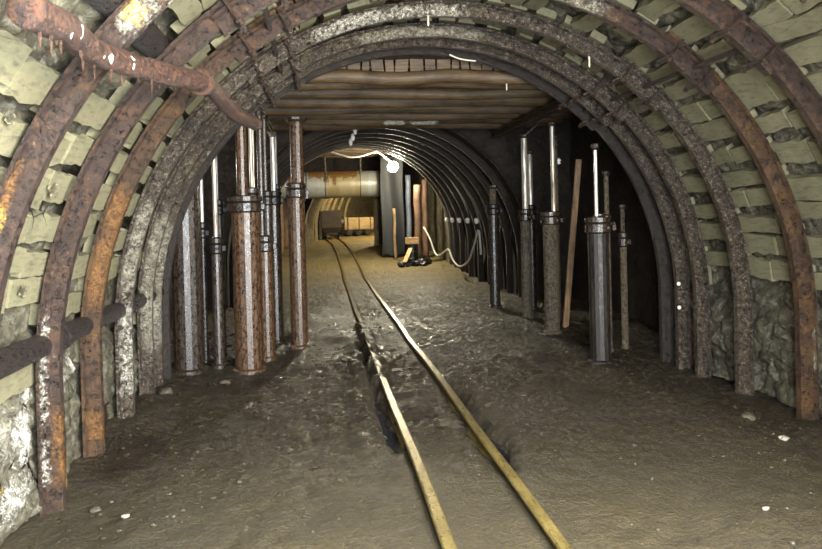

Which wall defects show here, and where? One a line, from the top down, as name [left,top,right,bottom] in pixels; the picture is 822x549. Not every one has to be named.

corrosion [120,0,148,28]
corrosion [0,161,23,229]
corrosion [87,186,132,306]
corrosion [51,407,72,482]
corrosion [86,413,105,440]